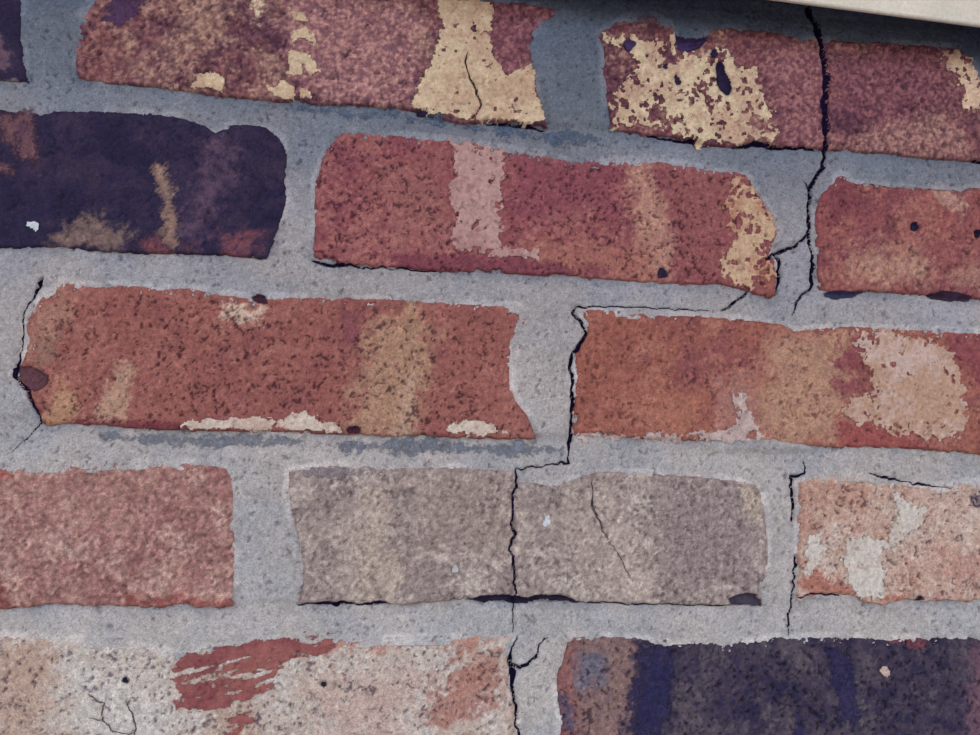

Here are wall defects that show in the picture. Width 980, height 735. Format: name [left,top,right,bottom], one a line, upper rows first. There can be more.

peeling [190,71,225,93]
peeling [266,7,321,102]
peeling [411,0,545,129]
peeling [602,32,779,150]
crack [731,5,833,315]
peeling [720,170,777,291]
crack [11,279,44,453]
peeling [840,326,969,442]
crack [507,292,747,735]
crack [789,462,806,521]
crack [297,599,390,607]